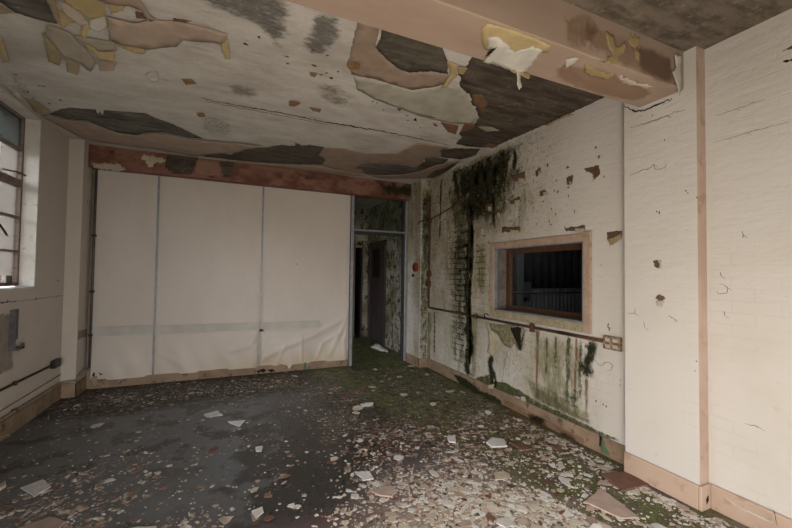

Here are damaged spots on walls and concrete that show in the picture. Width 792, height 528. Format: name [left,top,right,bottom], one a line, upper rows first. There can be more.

peeling [0,0,230,75]
peeling [0,22,604,202]
crack [624,98,683,128]
peeling [672,54,682,96]
leakage [420,190,429,358]
leakage [439,146,520,404]
spalling [502,216,520,234]
spalling [607,231,622,247]
spalling [478,323,527,389]
leakage [530,338,597,421]